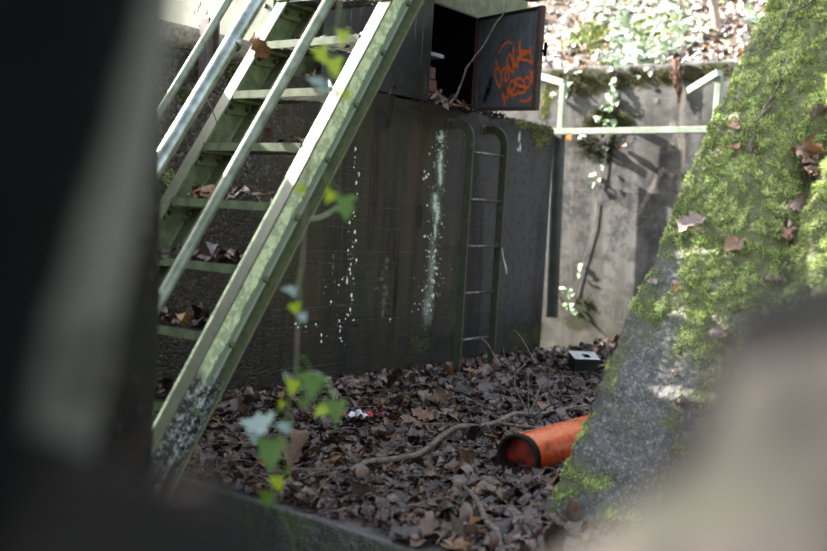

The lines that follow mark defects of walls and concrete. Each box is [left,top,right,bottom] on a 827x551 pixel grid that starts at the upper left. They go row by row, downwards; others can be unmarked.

damp [417,130,448,239]
damp [409,246,444,316]